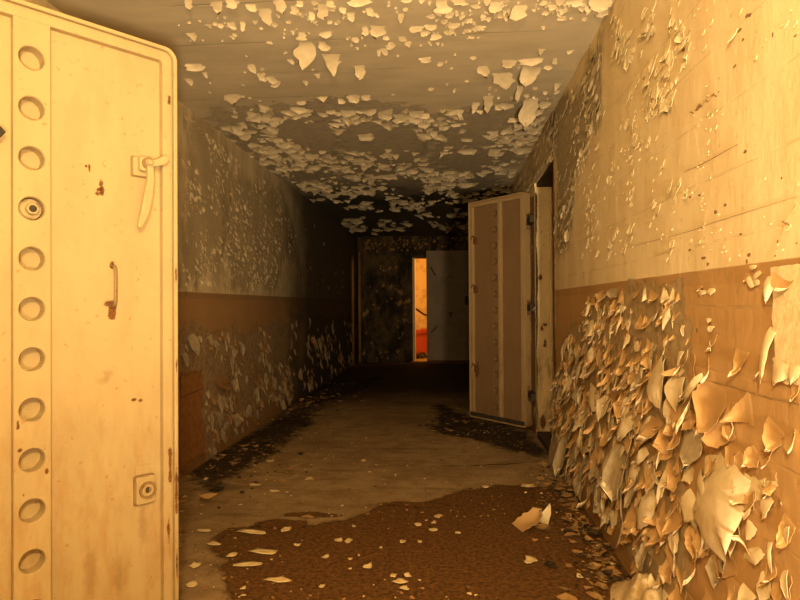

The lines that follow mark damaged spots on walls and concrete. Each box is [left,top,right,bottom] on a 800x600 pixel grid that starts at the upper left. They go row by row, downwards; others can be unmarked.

peeling [178,284,411,461]
peeling [178,0,691,430]
peeling [547,277,796,600]
peeling [721,240,800,402]